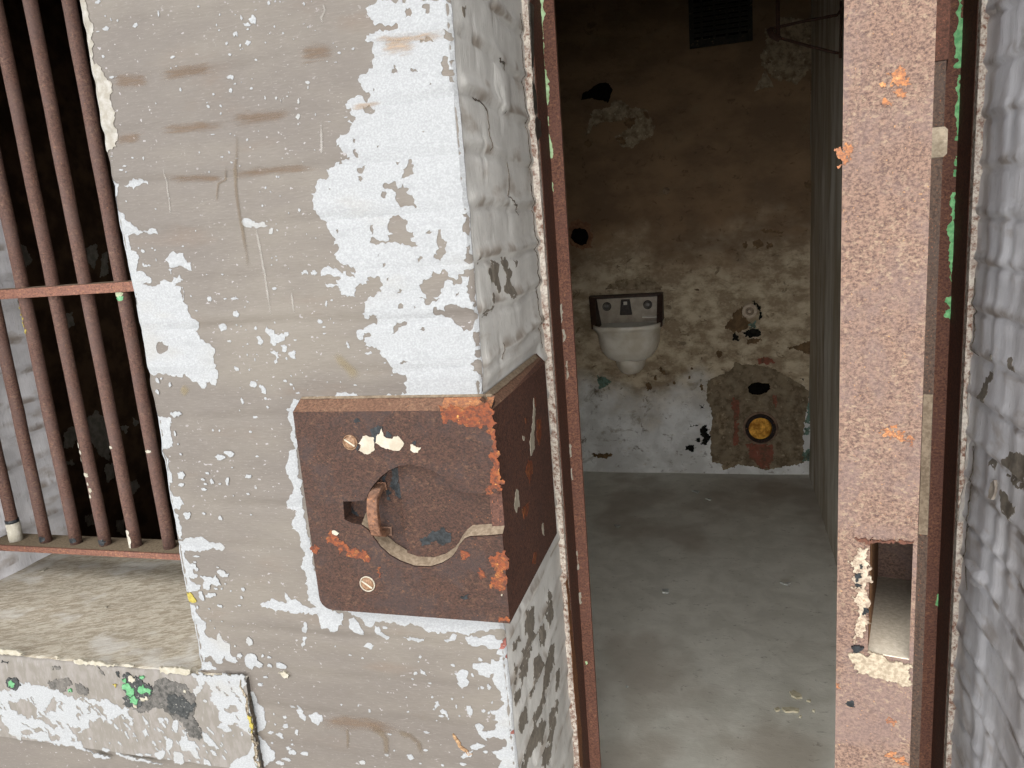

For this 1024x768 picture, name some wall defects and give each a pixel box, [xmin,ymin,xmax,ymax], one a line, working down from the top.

peeling [86,243,109,277]
peeling [113,157,218,394]
peeling [225,0,281,56]
peeling [288,0,518,395]
corrosion [834,143,853,169]
corrosion [879,65,910,106]
spalling [748,382,770,395]
peeling [0,410,323,768]
peeling [201,297,560,768]
corrosion [566,579,583,768]